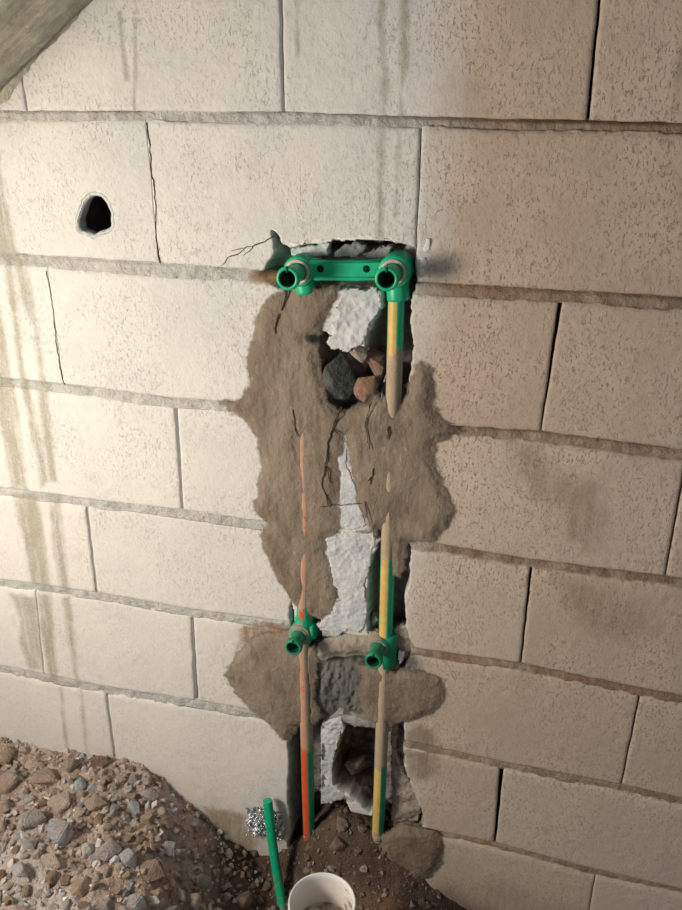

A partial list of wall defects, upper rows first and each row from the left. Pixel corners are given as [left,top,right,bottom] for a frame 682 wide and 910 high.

crack [146,123,161,263]
crack [218,235,276,268]
crack [46,271,65,385]
damp [0,330,20,485]
damp [21,371,55,479]
crack [321,402,389,521]
damp [20,497,55,674]